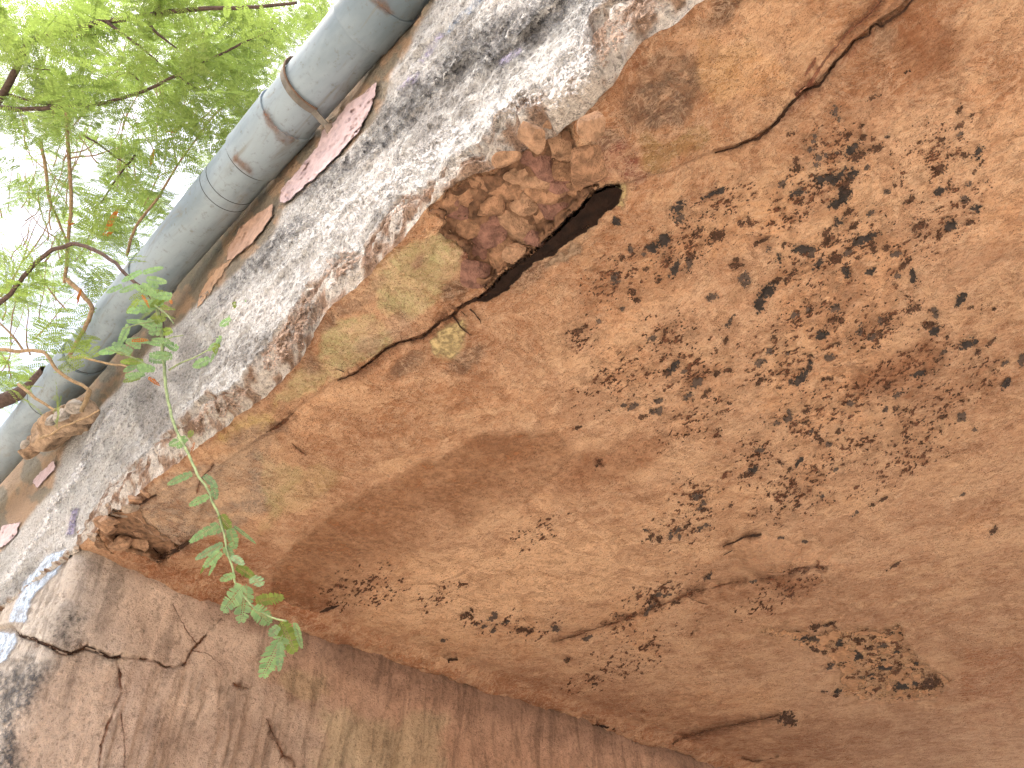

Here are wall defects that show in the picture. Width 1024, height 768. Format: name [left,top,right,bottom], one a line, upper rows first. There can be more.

crack [715,0,913,154]
flaking render [428,110,626,302]
crack [336,289,491,381]
damp [559,102,1024,555]
flaking render [67,489,180,563]
damp [272,434,561,615]
damp [510,513,572,555]
crack [16,605,245,689]
damp [459,606,570,642]
damp [553,566,713,700]
damp [723,565,824,623]
crack [98,714,126,768]